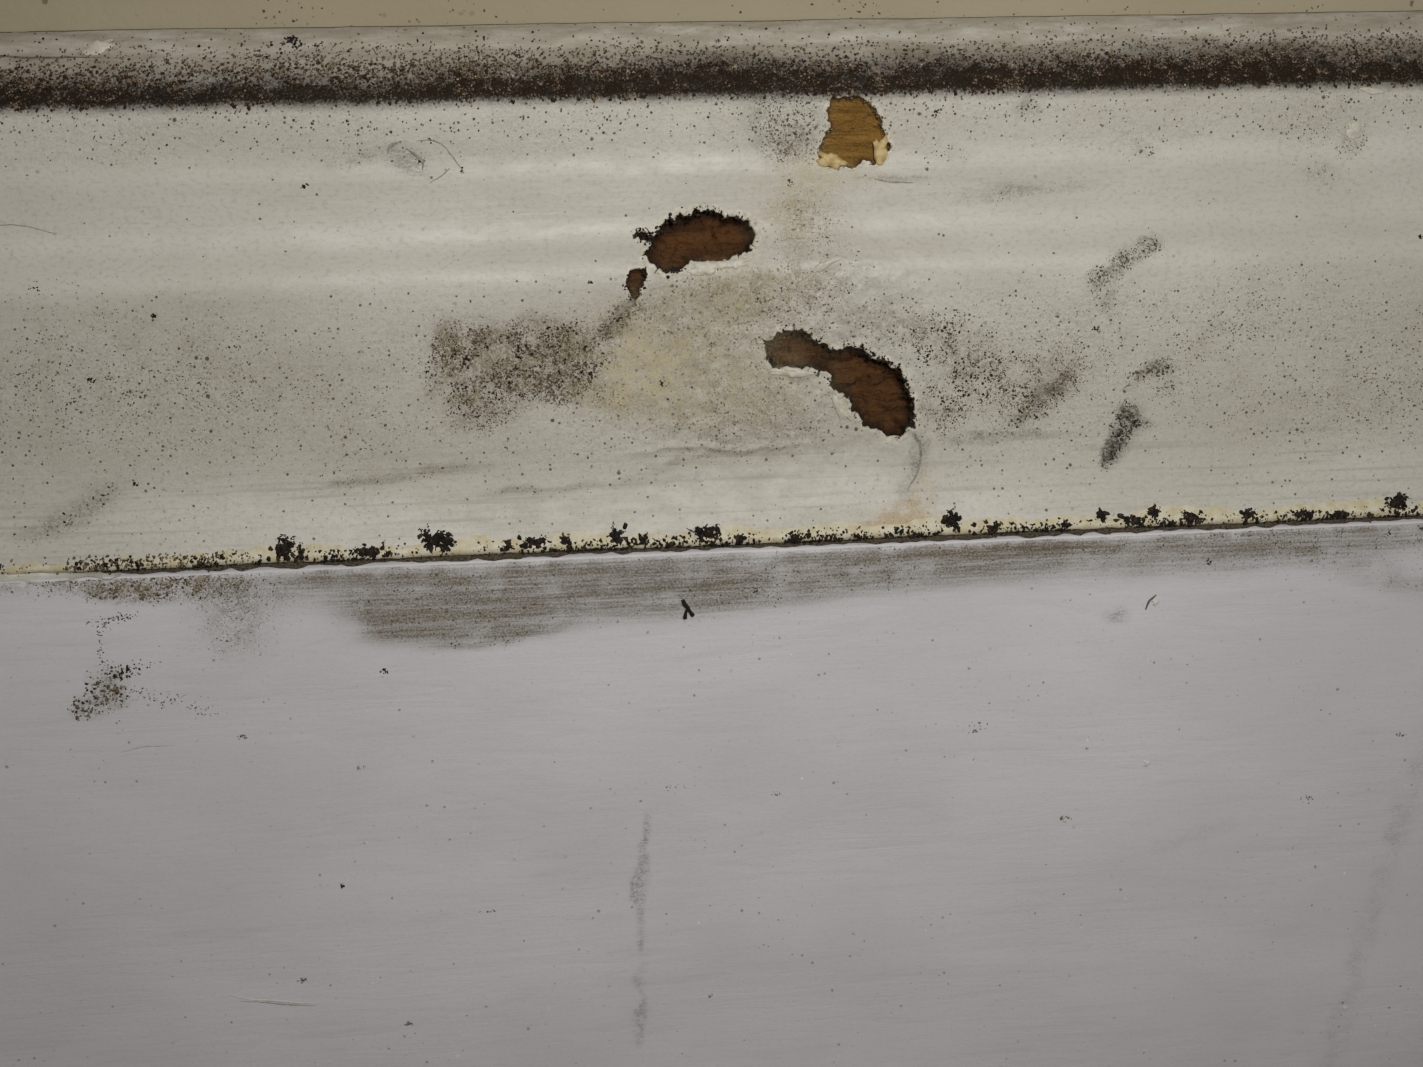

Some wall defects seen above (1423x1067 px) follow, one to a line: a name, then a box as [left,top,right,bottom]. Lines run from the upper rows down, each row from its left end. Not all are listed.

peeling [815,92,896,172]
spalling [626,208,755,299]
water stain [0,86,1423,547]
spalling [763,329,915,437]
water stain [29,525,1423,721]